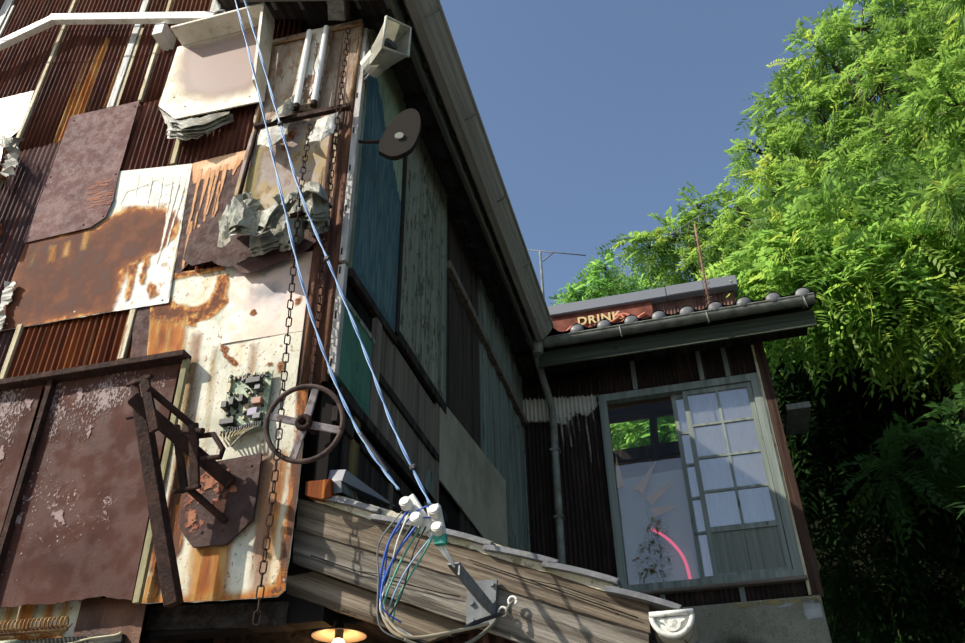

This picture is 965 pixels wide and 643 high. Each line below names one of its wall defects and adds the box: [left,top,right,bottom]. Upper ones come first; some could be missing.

corrosion [56,38,110,143]
corrosion [1,177,229,397]
corrosion [220,344,238,366]
peeling [0,388,34,464]
peeling [48,370,139,442]
peeling [15,459,116,546]
corrosion [167,389,307,601]
corrosion [142,544,163,603]